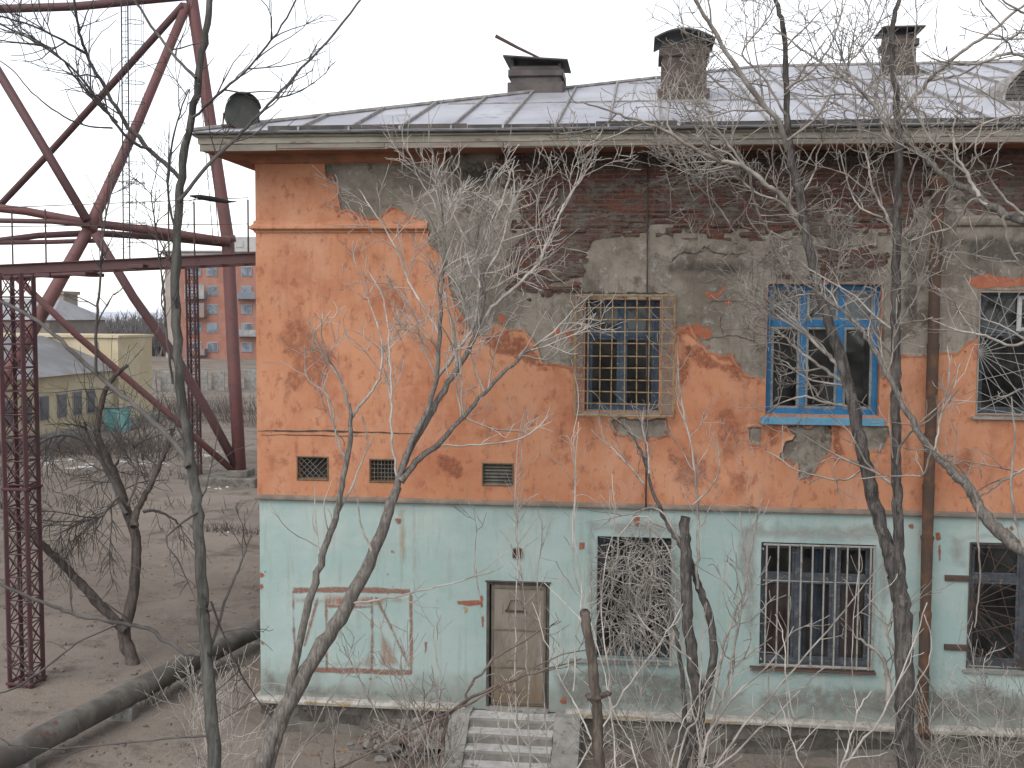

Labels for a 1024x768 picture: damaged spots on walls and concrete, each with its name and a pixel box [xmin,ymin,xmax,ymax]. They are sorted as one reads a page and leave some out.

spalling [322,148,1024,444]
spalling [741,424,842,483]
spalling [862,423,891,455]